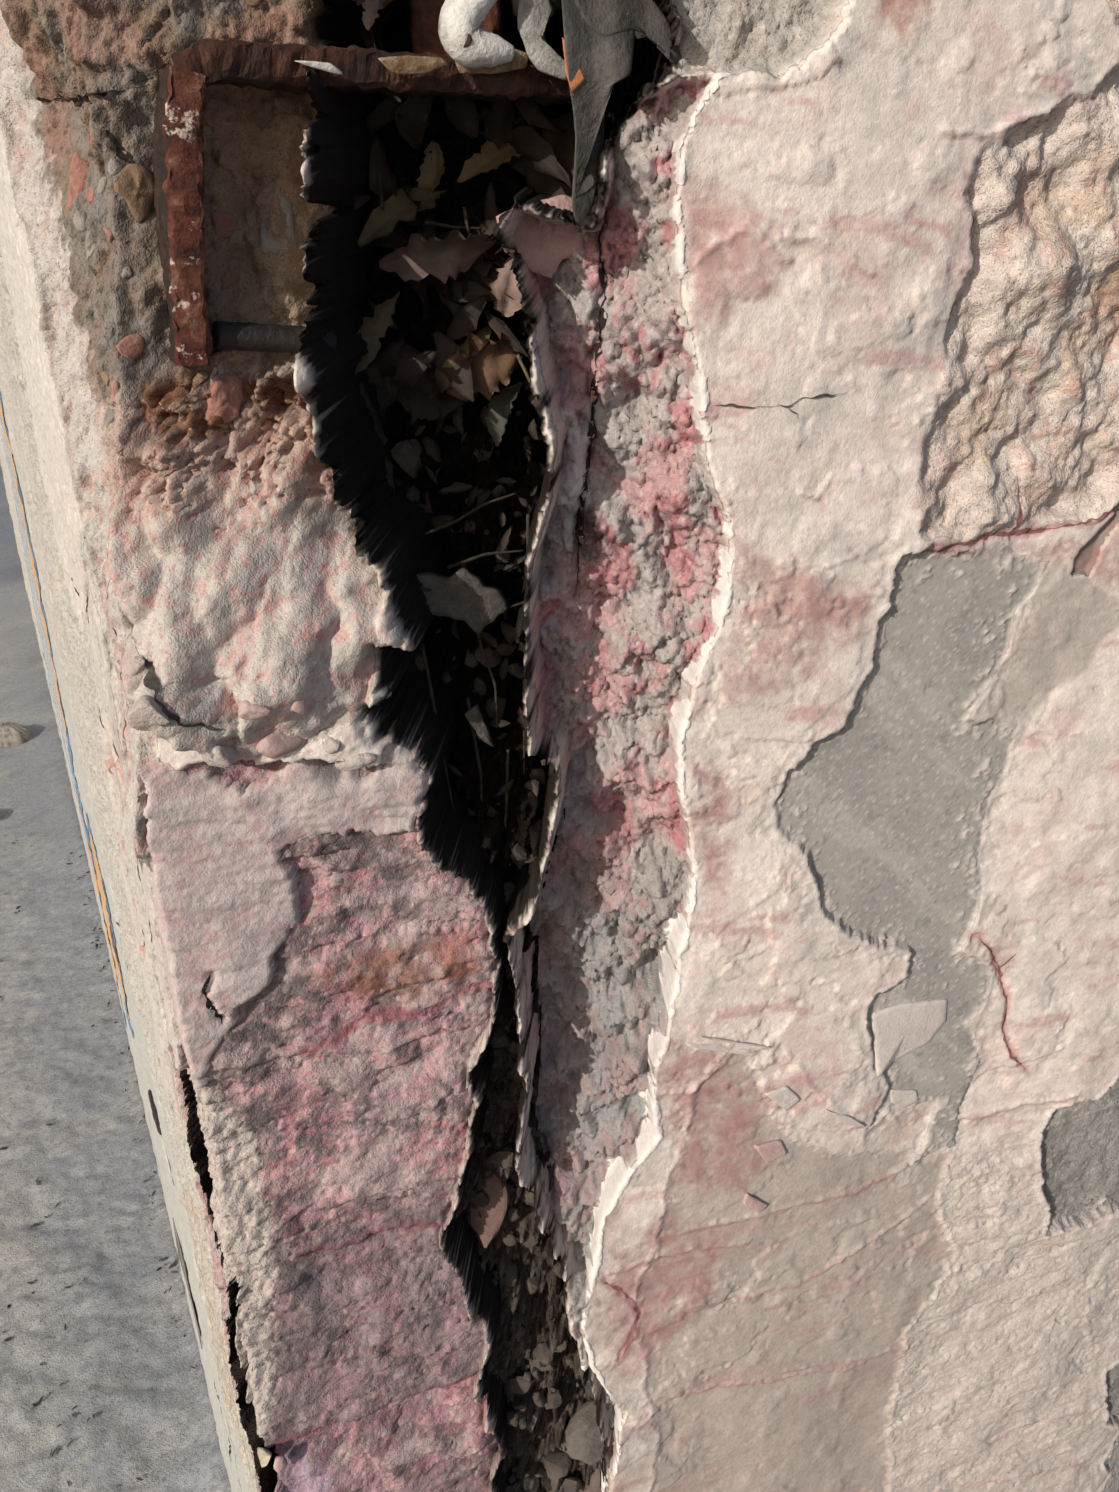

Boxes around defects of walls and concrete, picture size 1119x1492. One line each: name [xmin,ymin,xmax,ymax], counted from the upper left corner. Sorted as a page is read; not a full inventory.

crack [35,84,149,164]
crack [346,0,411,52]
crack [501,0,564,59]
peeling [0,0,498,1492]
crack [357,35,657,888]
spalling [501,0,849,1492]
peeling [776,65,1119,1169]
crack [201,972,223,1024]
crack [150,1069,278,1492]
crack [455,922,639,1492]
peeling [1041,1080,1119,1234]
peeling [1102,1364,1119,1492]